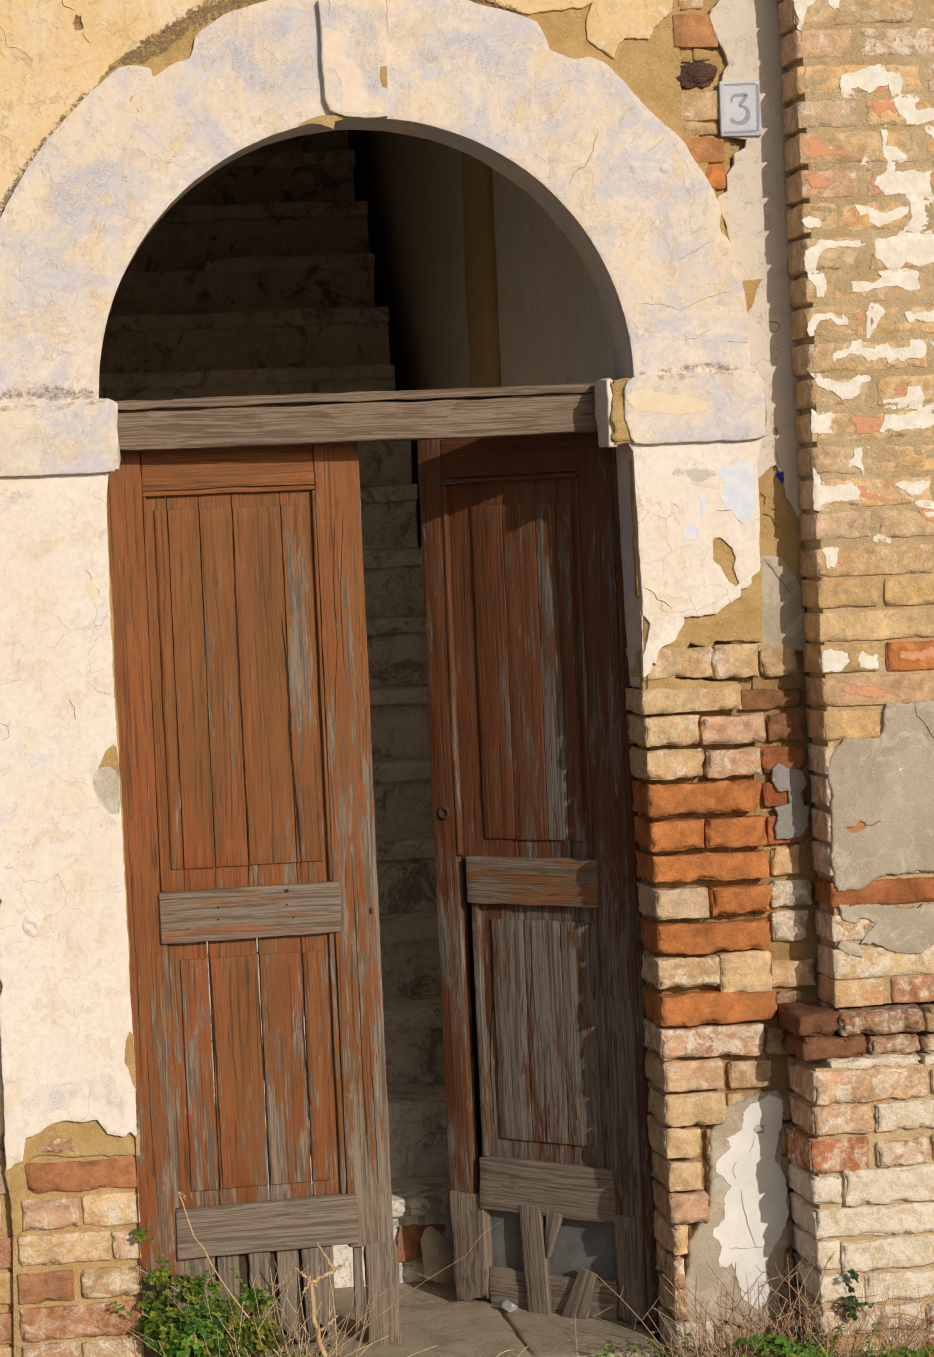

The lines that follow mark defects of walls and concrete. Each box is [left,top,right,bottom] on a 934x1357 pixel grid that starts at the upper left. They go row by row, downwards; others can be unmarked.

flaking render [98,0,268,85]
peeling [296,27,382,129]
flaking render [469,0,731,197]
peeling [793,0,840,30]
flaking render [742,279,762,313]
peeling [801,64,934,523]
peeling [822,547,845,569]
peeling [819,649,890,697]
flaking render [92,742,119,814]
flaking render [625,458,816,1357]
flaking render [125,1031,137,1091]
flaking render [0,1121,144,1357]